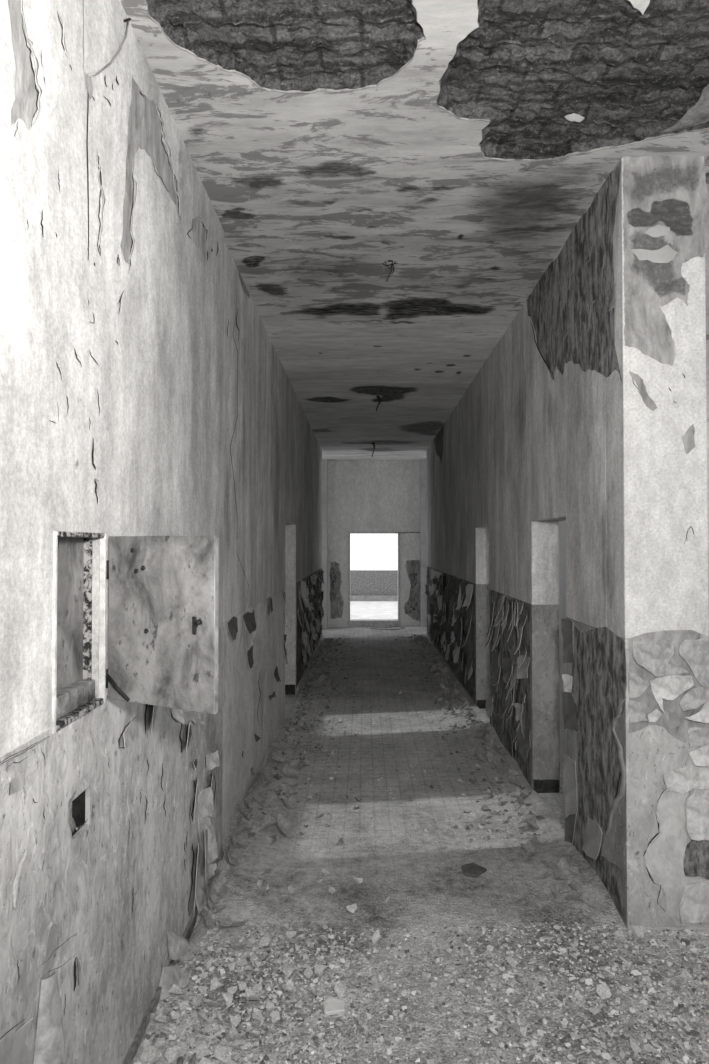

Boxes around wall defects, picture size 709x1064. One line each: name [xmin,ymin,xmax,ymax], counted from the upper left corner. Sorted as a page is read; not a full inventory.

flaking render [145,0,426,94]
flaking render [436,0,709,161]
peeling [118,75,218,275]
leakage [222,208,256,219]
leakage [232,176,283,188]
leakage [300,162,372,178]
leakage [256,283,286,295]
leakage [298,287,495,324]
peeling [526,160,658,411]
leakage [307,386,415,403]
peeling [218,562,344,742]
peeling [561,619,709,924]